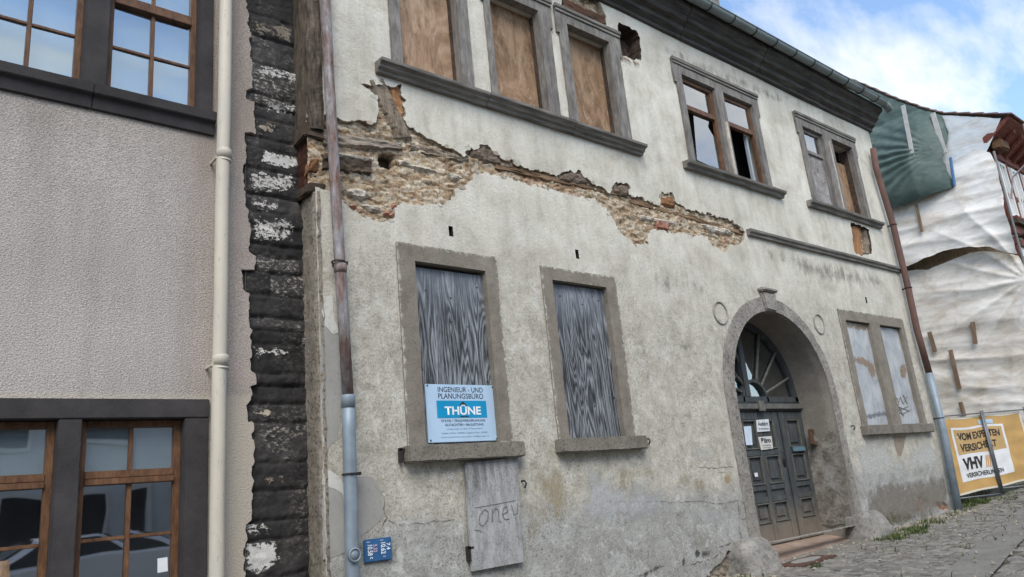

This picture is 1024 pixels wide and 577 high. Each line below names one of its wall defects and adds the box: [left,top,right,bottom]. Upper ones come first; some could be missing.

spalling [561,0,641,64]
spalling [307,79,745,252]
spalling [851,223,872,256]
peeling [320,295,341,449]
peeling [322,470,345,560]
leakage [869,478,947,525]